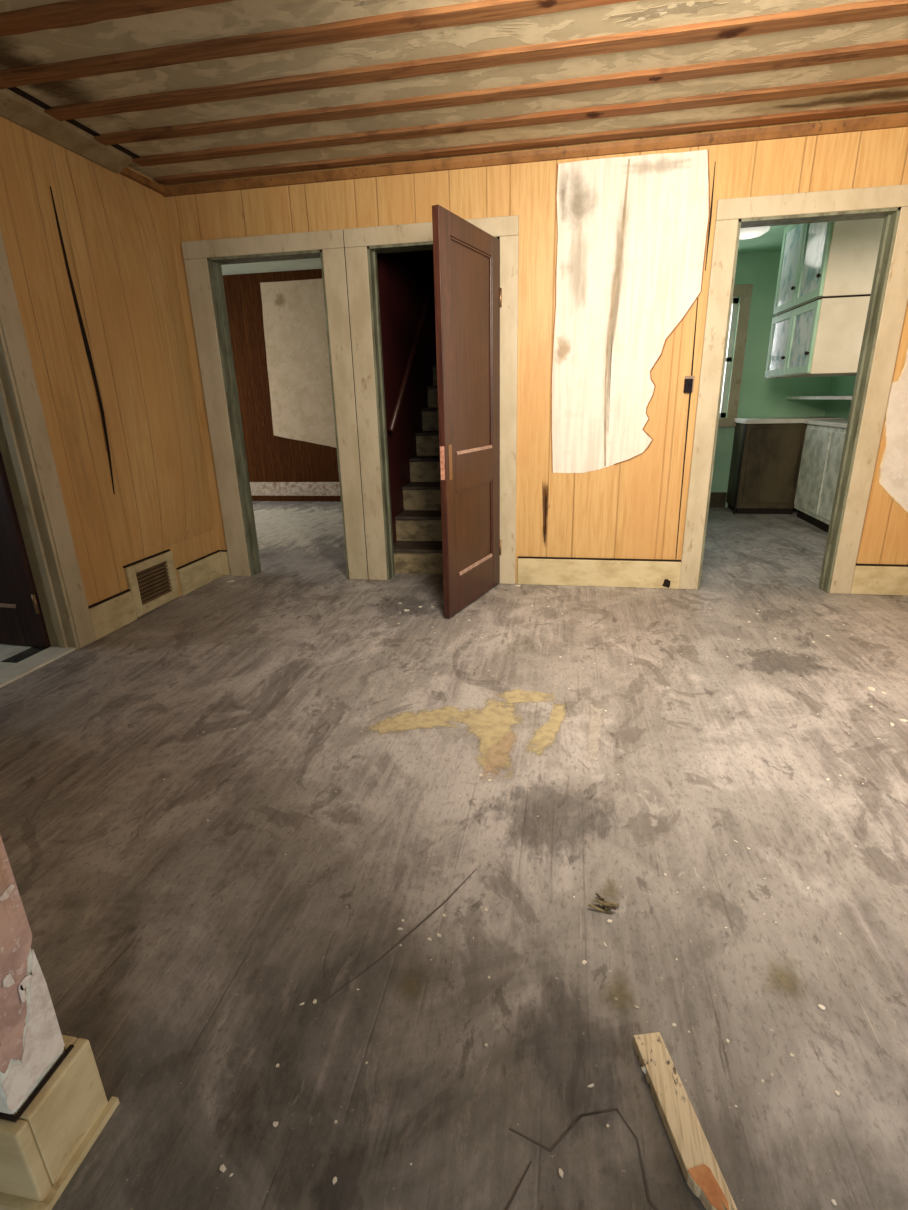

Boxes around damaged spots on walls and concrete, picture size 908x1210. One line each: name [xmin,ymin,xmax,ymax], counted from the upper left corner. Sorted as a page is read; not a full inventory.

crack [50,186,115,494]
peeling [551,149,710,473]
peeling [879,345,908,513]
peeling [1,949,65,1112]
crack [505,1108,658,1210]